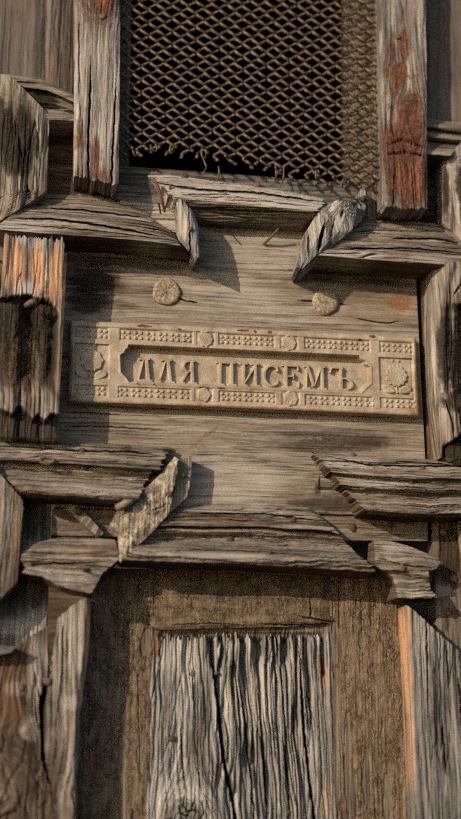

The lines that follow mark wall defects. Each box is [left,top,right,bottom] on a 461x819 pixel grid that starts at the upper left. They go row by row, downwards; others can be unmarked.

water stain [0,96,38,175]
water stain [33,93,58,104]
crack [85,65,93,168]
crack [109,88,117,175]
crack [56,630,64,712]
crack [178,645,268,819]
crack [265,602,329,819]